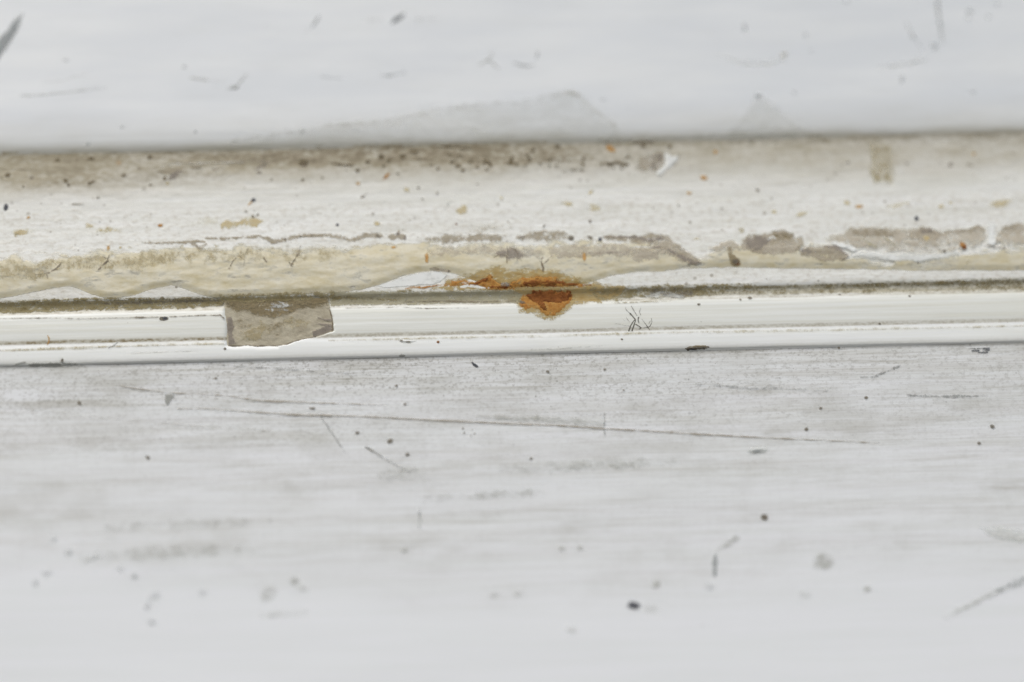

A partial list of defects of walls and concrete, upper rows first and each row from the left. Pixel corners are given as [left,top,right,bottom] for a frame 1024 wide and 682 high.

peeling [144,230,406,249]
peeling [426,226,701,272]
peeling [710,223,1024,262]
corrosion [405,265,626,320]
peeling [220,290,334,347]